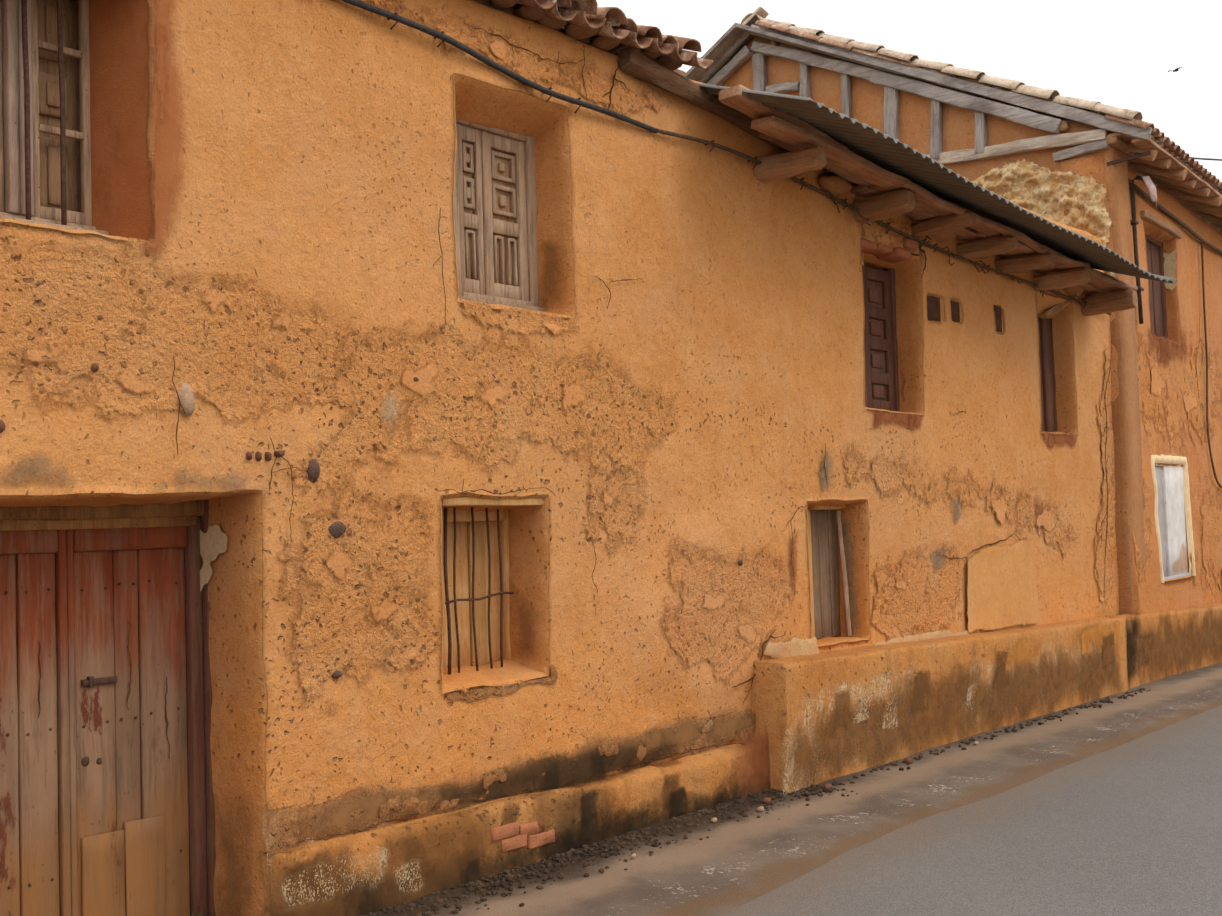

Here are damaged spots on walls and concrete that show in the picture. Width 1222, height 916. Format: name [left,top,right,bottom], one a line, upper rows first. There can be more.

flaking render [0,219,677,715]
flaking render [661,536,796,683]
flaking render [843,440,1077,557]
crack [939,530,1024,624]
crack [1101,346,1112,601]
water stain [266,615,1222,916]